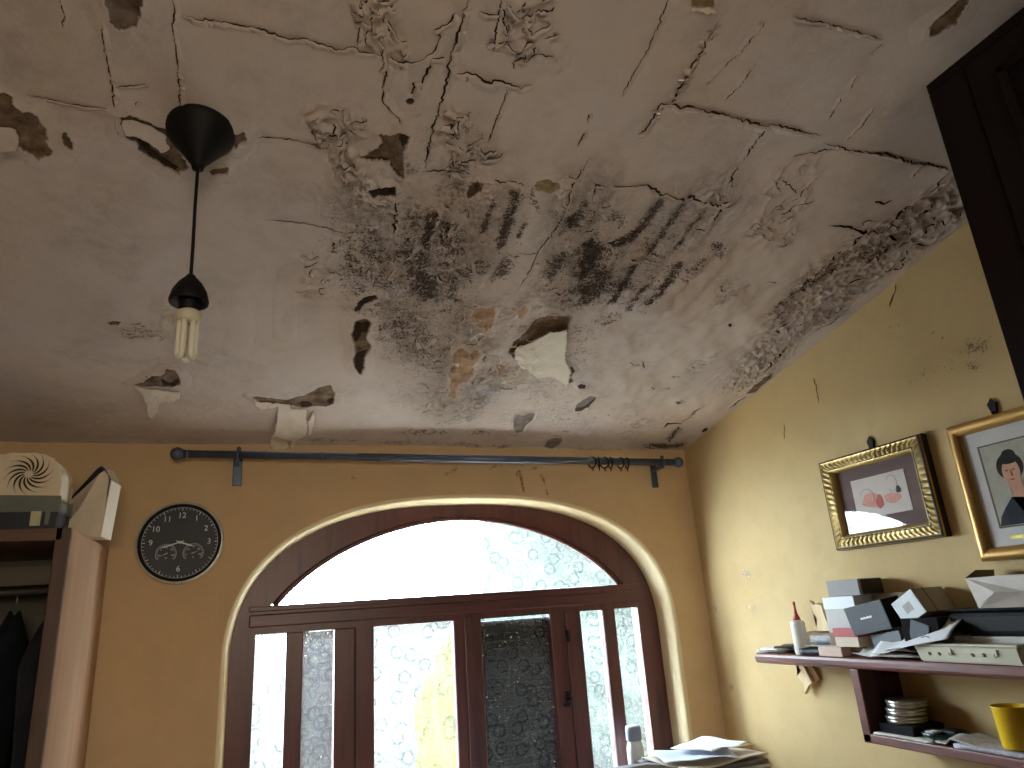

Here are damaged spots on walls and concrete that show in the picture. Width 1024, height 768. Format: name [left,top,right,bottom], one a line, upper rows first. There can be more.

spalling [0,77,91,172]
spalling [81,0,166,48]
spalling [97,99,263,187]
crack [171,0,542,190]
crack [265,195,454,246]
water stain [339,146,726,372]
crack [464,113,662,309]
crack [621,0,672,98]
crack [611,16,951,331]
spalling [341,286,391,374]
spalling [443,303,587,400]
peeling [241,379,345,450]